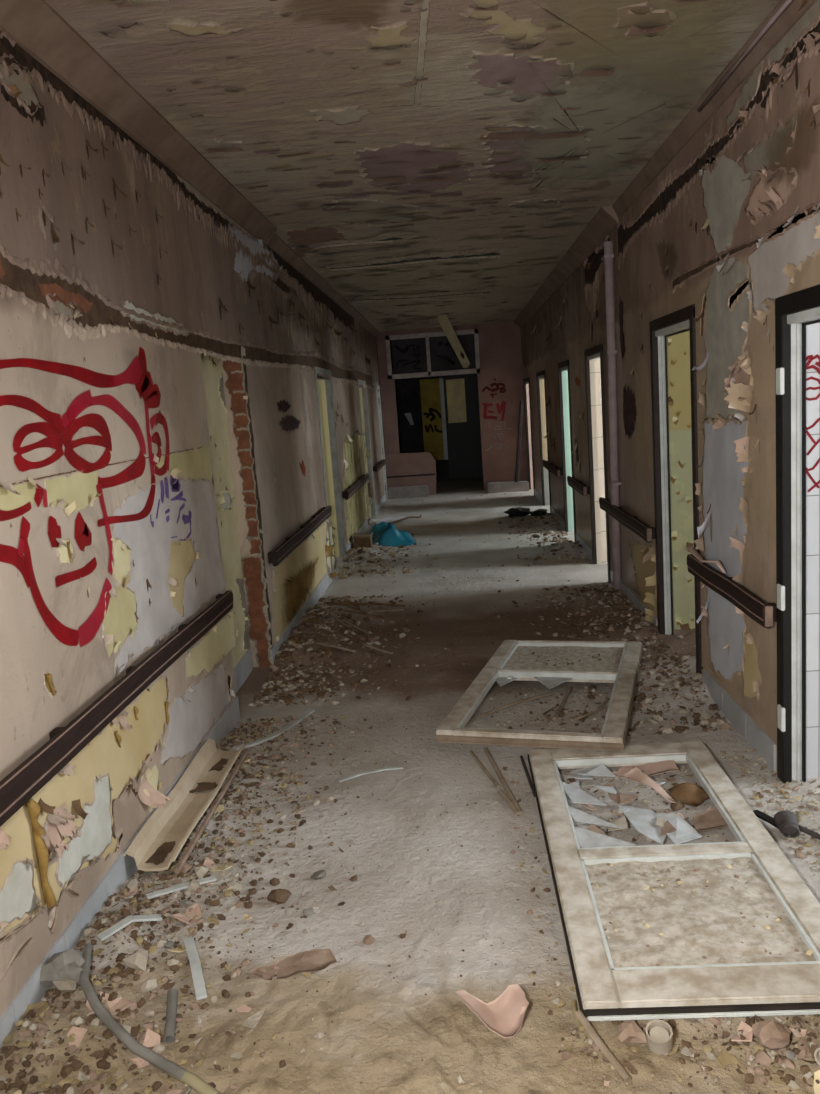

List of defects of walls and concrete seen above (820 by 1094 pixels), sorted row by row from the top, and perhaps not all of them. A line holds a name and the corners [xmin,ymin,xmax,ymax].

peeling [363,0,427,67]
peeling [459,0,576,63]
peeling [610,0,709,40]
flaking render [0,53,42,116]
peeling [199,105,650,327]
peeling [663,0,820,587]
peeling [0,154,374,945]
peeling [628,540,657,623]
peeling [673,561,762,705]